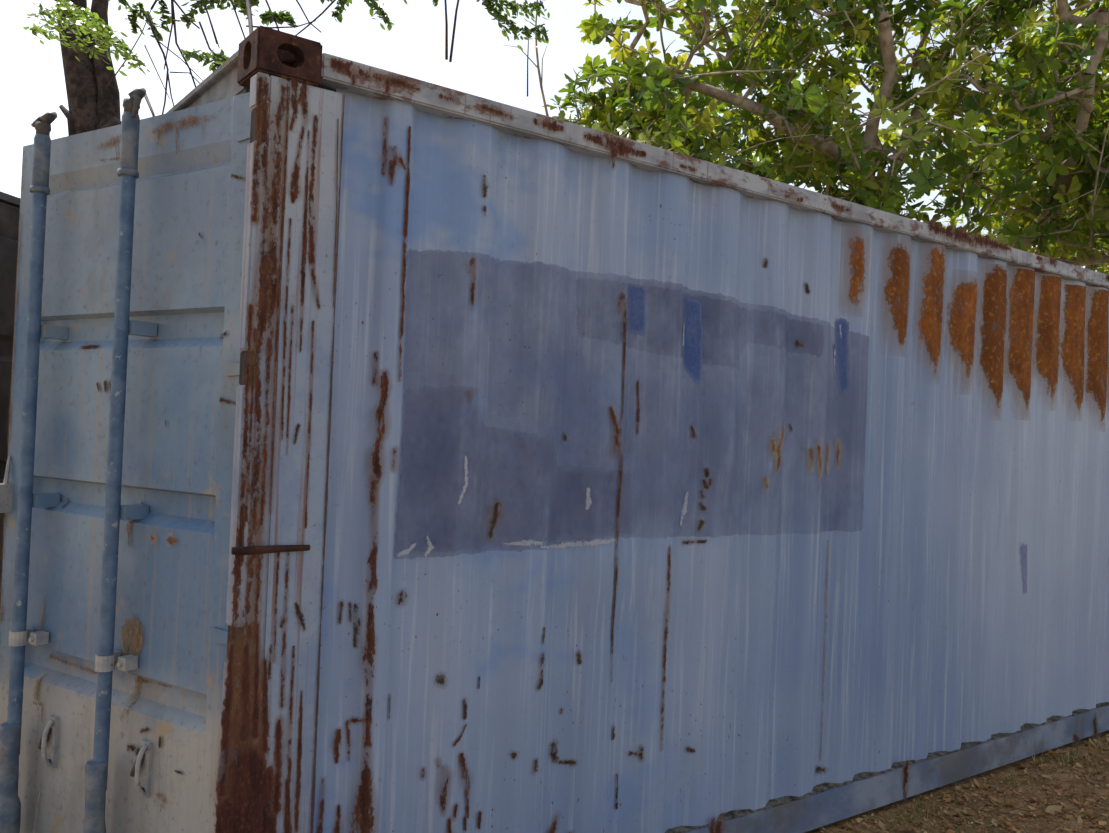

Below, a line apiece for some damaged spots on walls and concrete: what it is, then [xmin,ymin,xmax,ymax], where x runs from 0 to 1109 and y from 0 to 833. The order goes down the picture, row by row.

rust [330,56,420,93]
rust [153,116,206,153]
rust [533,118,564,132]
rust [584,133,646,168]
rust [848,237,865,306]
rust [884,221,1109,424]
rust [214,76,411,833]
rust [422,725,482,833]